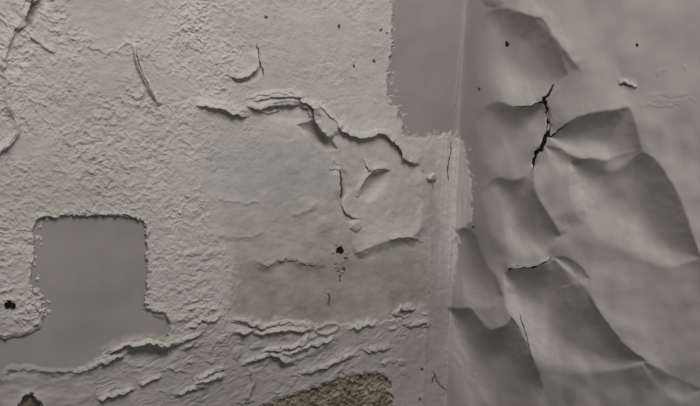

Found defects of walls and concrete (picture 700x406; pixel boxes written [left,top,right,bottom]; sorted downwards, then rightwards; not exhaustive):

peeling [196,0,465,166]
crack [514,84,567,168]
peeling [0,209,432,406]
crack [506,256,552,270]